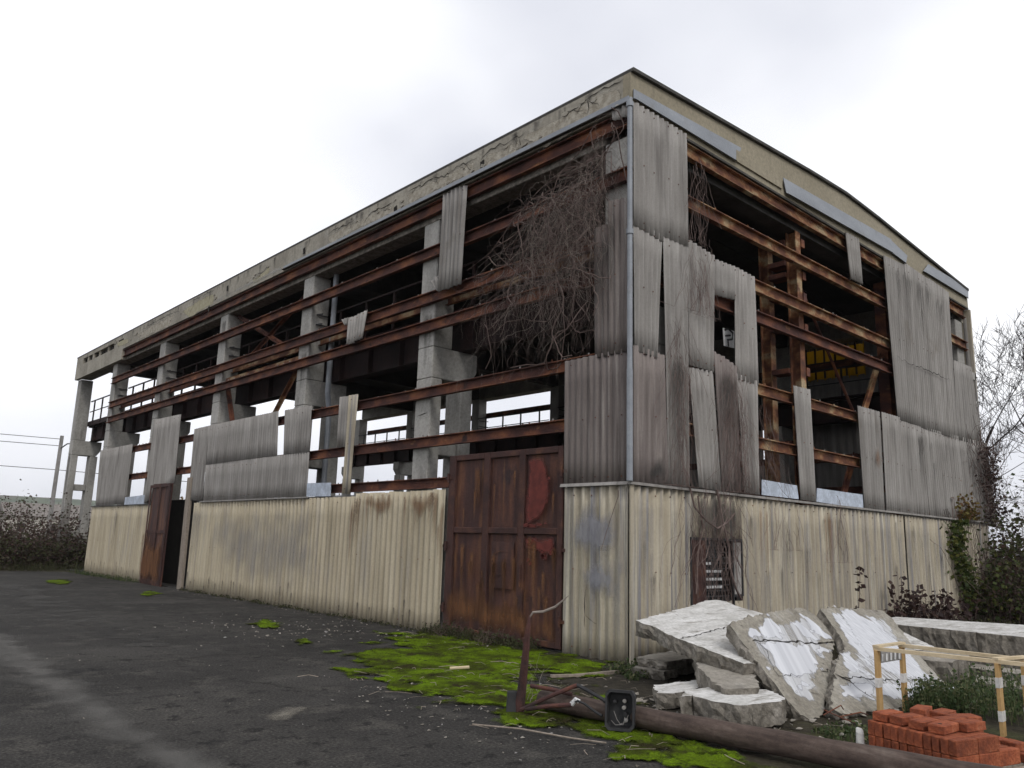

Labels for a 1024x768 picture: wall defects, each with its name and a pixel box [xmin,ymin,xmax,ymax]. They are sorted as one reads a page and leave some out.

crack [562,80,622,118]
crack [330,135,522,233]
rust [140,535,160,580]
rust [447,540,553,640]
crack [753,639,940,698]